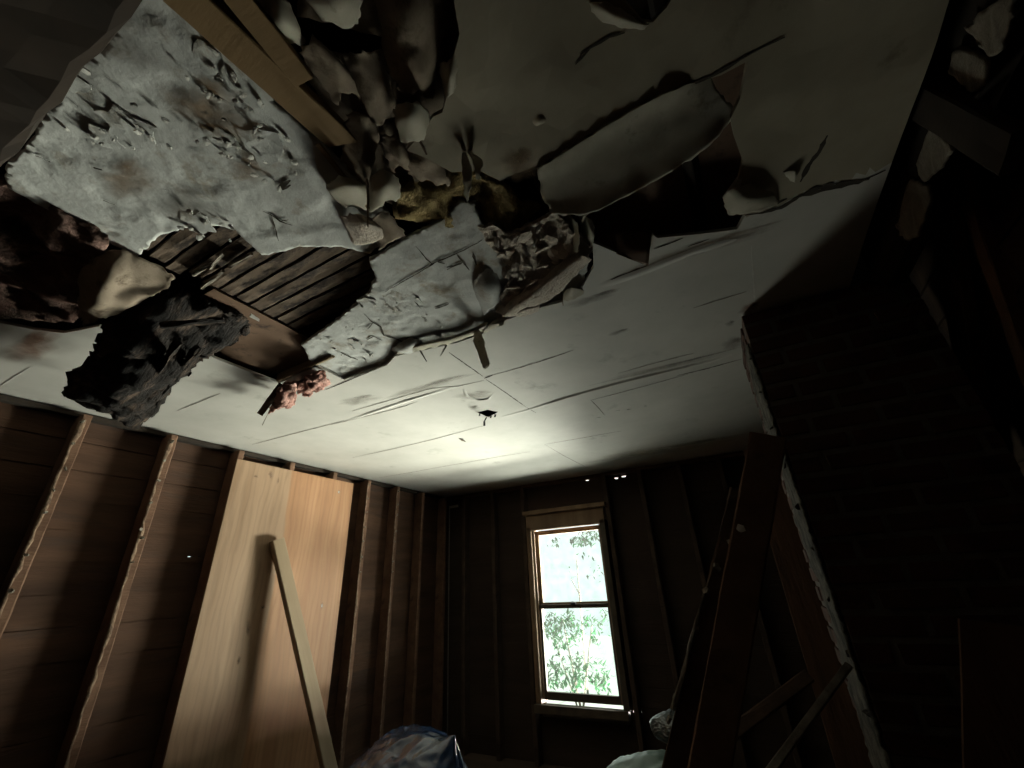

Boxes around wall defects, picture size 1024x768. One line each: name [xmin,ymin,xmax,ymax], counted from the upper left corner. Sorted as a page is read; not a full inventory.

peeling [258,0,306,46]
peeling [305,0,363,29]
spalling [69,67,92,94]
spalling [87,102,172,150]
spalling [193,39,298,193]
peeling [392,101,431,143]
spalling [177,209,235,242]
peeling [326,169,406,251]
spalling [320,208,595,369]
crack [326,314,409,390]
crack [252,350,573,445]
crack [353,353,740,477]